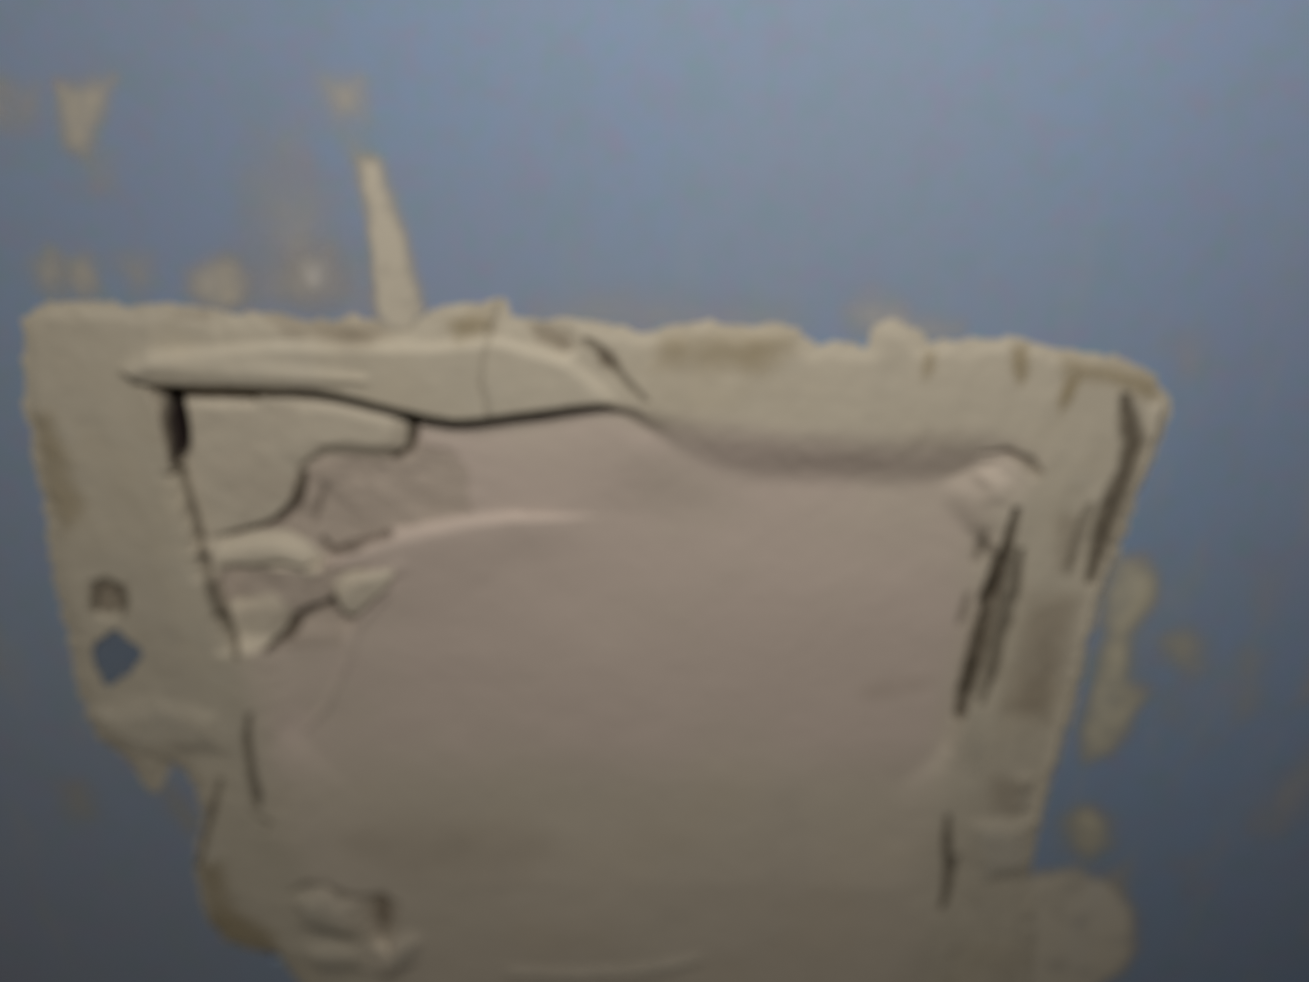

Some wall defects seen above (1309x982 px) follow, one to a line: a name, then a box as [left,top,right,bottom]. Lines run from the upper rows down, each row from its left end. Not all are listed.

spalling [95,630,143,685]
crack [169,387,337,651]
spalling [183,387,474,654]
crack [392,412,418,458]
crack [954,507,1022,716]
crack [1087,396,1140,582]